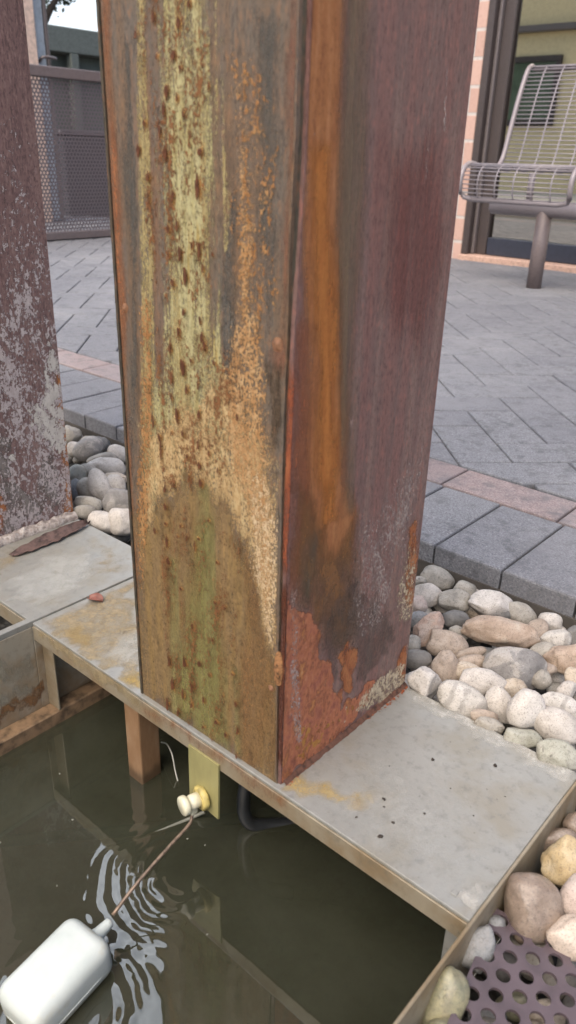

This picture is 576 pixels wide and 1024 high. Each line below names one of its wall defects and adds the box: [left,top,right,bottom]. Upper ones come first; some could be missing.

corrosion [108,99,126,341]
corrosion [57,374,73,513]
corrosion [133,0,243,754]
corrosion [405,521,418,608]